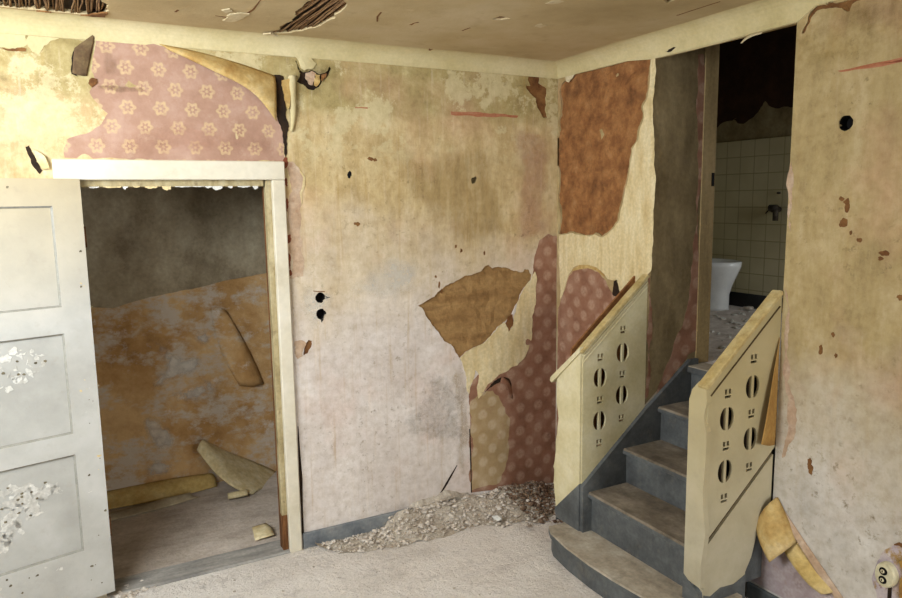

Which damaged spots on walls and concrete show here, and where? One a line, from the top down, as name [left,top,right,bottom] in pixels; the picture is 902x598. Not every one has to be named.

spalling [0,0,108,17]
spalling [263,0,346,36]
spalling [717,25,797,128]
spalling [558,59,656,299]
spalling [418,251,537,398]
peeling [0,347,47,393]
peeling [0,482,63,554]